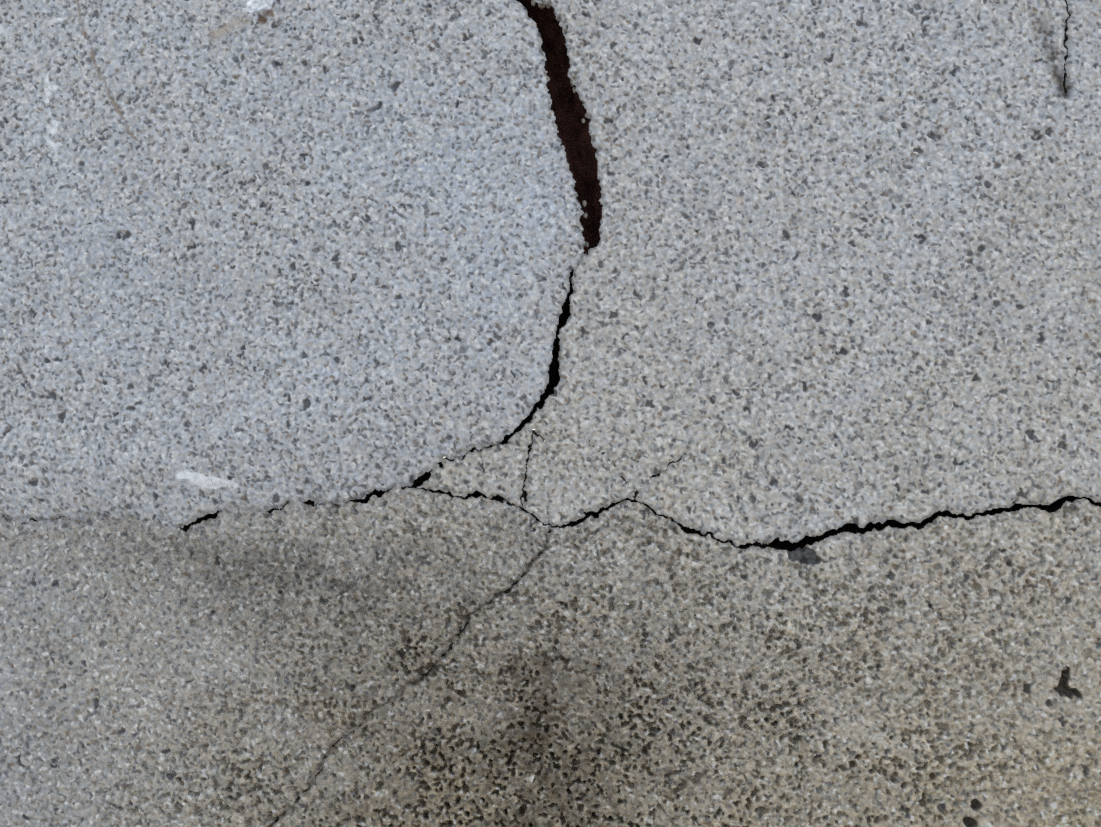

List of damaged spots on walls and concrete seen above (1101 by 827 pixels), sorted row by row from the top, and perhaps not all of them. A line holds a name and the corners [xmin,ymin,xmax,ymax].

crack [266,0,1101,701]
crack [177,510,221,532]
crack [269,717,366,827]